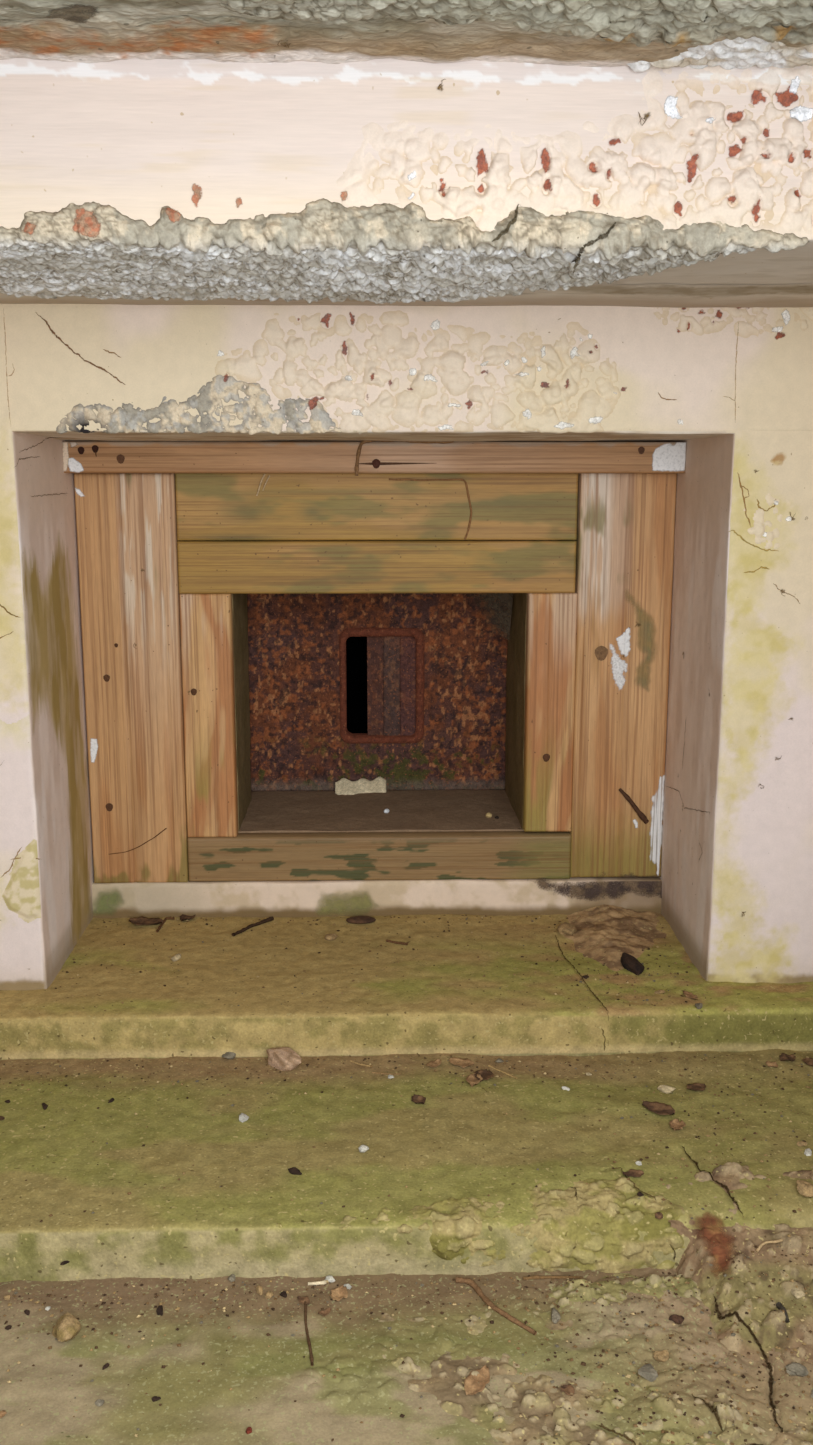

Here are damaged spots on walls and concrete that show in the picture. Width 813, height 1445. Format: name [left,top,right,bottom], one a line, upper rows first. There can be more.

corrosion [0,16,290,63]
spalling [0,183,810,304]
crack [492,204,519,242]
crack [572,222,616,274]
crack [37,314,125,385]
spalling [56,375,362,435]
crack [682,1146,744,1217]
spalling [274,1161,702,1330]
spalling [378,1308,491,1335]
spalling [381,1347,813,1445]
crack [692,1296,783,1445]